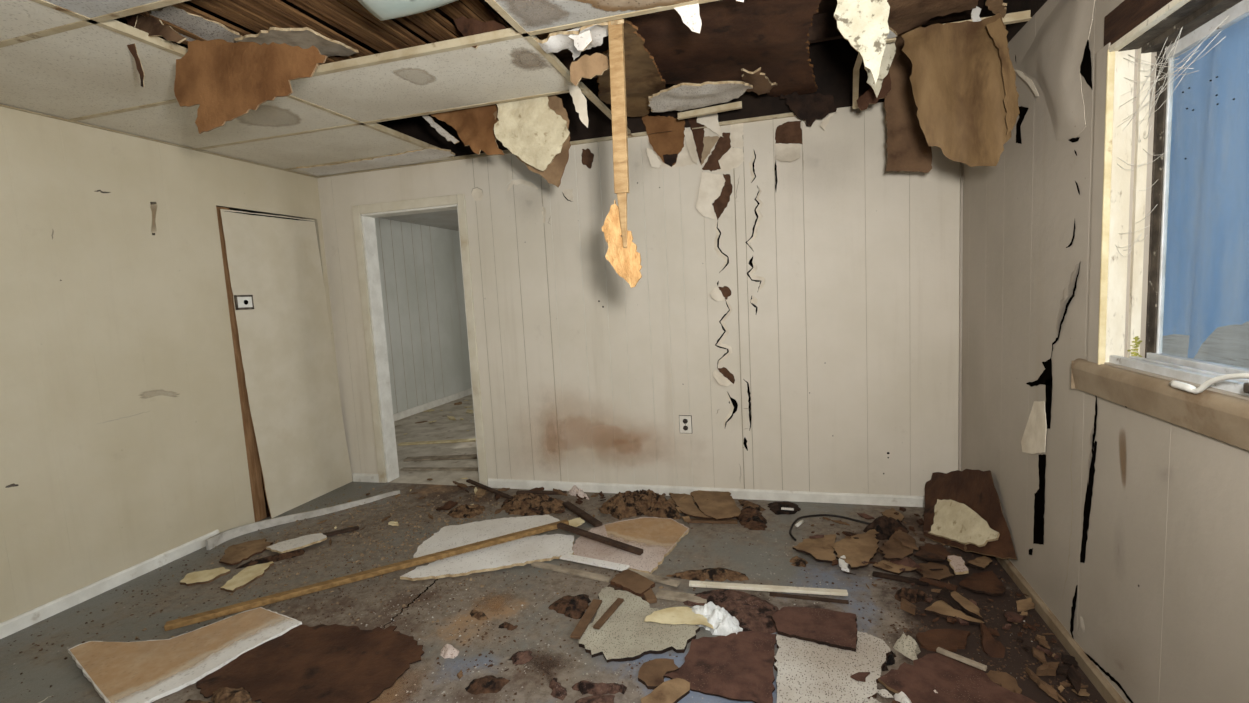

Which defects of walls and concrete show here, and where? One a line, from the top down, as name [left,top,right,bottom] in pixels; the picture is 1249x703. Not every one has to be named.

water stain [575,0,692,12]
peeling [674,3,702,34]
spalling [581,148,594,169]
spalling [642,107,744,220]
spalling [775,121,804,190]
crack [710,150,765,478]
crack [1021,150,1081,555]
crack [1070,397,1133,703]